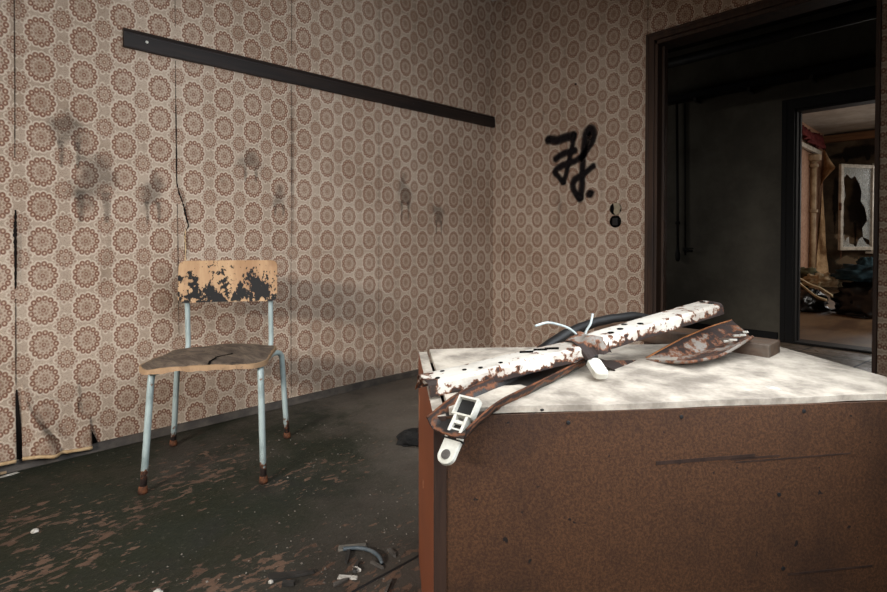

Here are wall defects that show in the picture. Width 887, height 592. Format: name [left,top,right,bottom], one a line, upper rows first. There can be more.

crack [175,105,192,261]